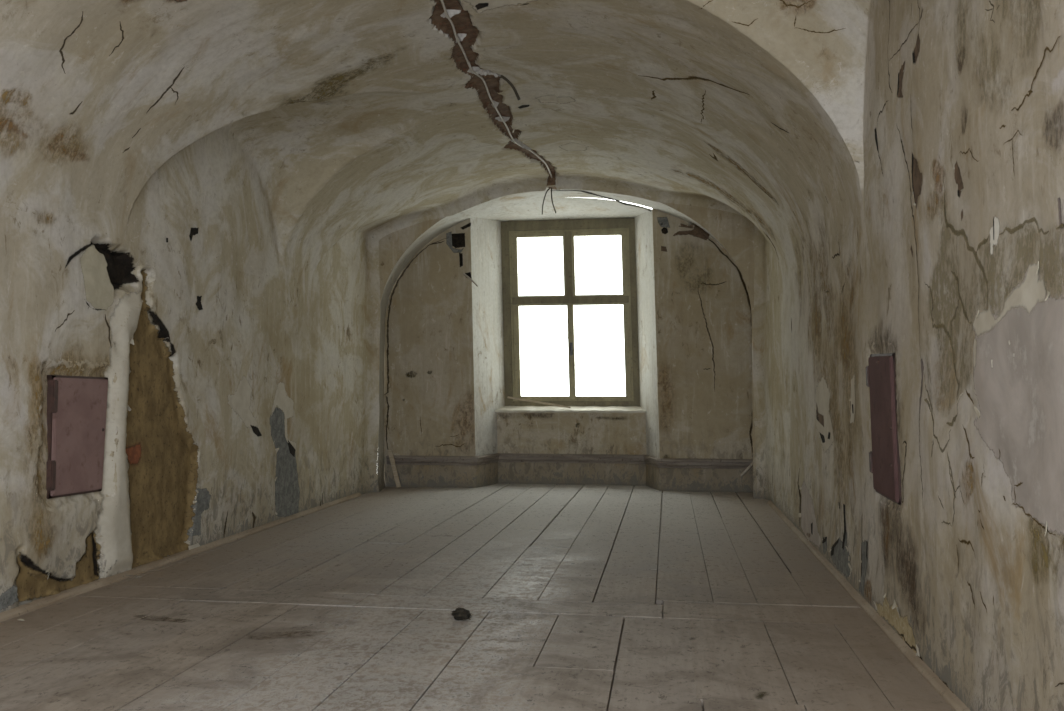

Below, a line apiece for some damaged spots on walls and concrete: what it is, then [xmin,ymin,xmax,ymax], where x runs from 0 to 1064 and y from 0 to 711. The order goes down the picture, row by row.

spalling [430,0,560,190]
crack [877,1,922,357]
crack [1000,36,1060,171]
spalling [65,243,212,568]
peeling [250,382,303,517]
peeling [814,377,834,452]
peeling [798,481,871,601]
peeling [973,261,1064,536]